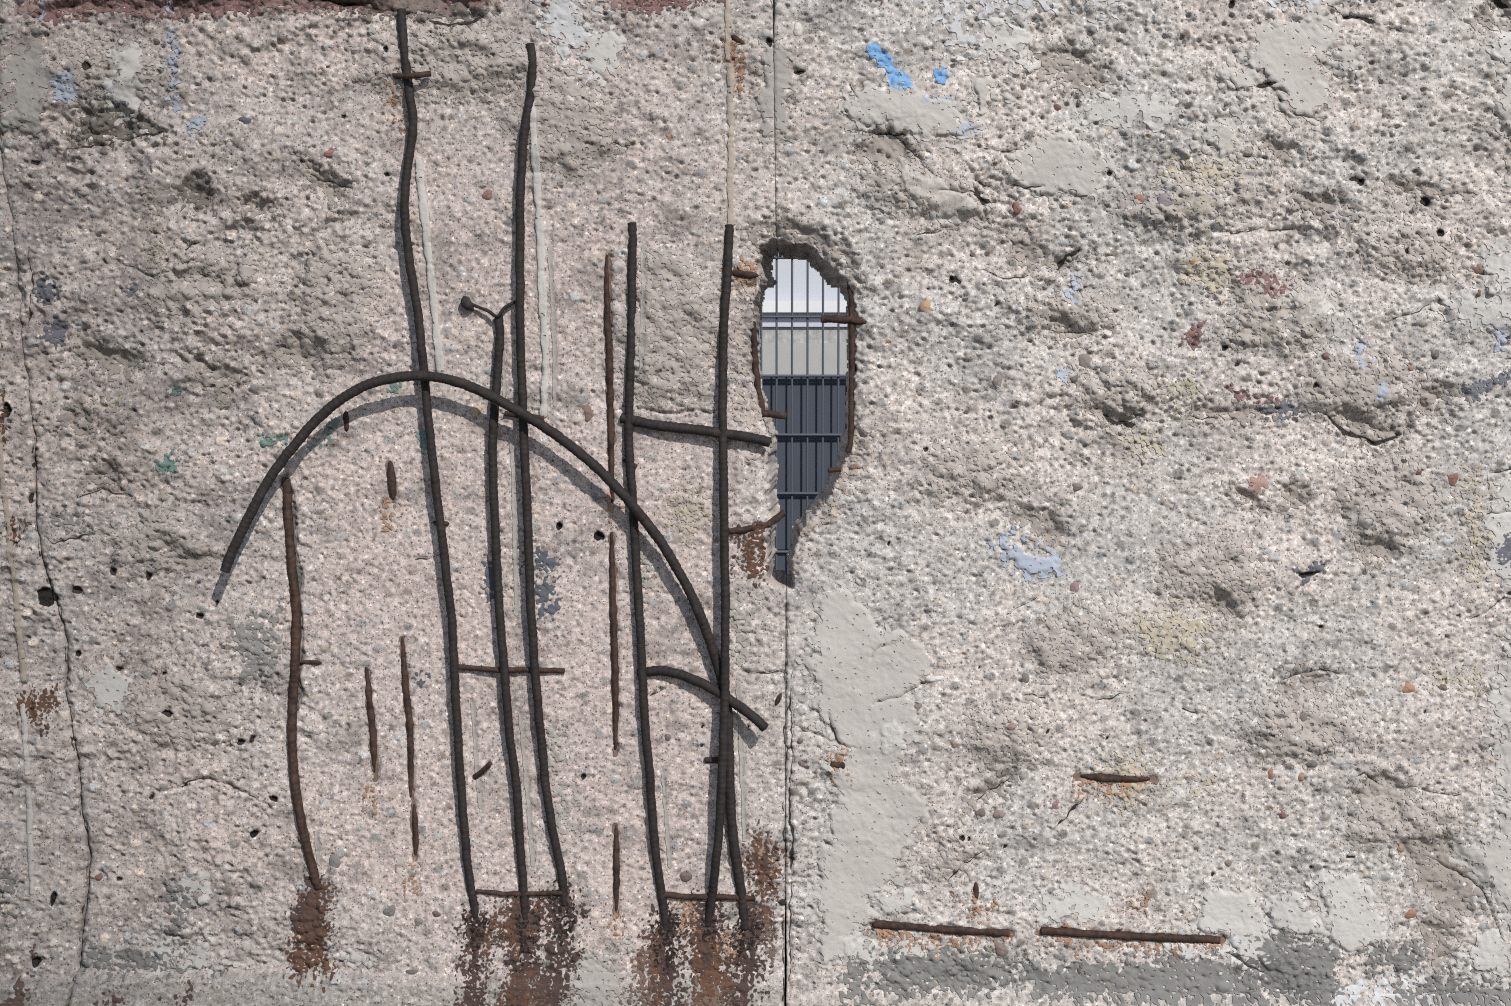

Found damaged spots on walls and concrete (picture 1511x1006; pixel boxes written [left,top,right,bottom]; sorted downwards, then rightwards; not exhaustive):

rust [373,52,408,156]
rust [713,29,762,107]
spalling [14,0,875,931]
rust [375,491,407,537]
rust [730,521,772,597]
rust [362,771,381,820]
rust [1071,764,1156,808]
rust [276,867,342,992]
rust [395,854,422,896]
rust [443,819,792,1006]
rust [860,889,1013,962]
rust [1033,885,1231,962]